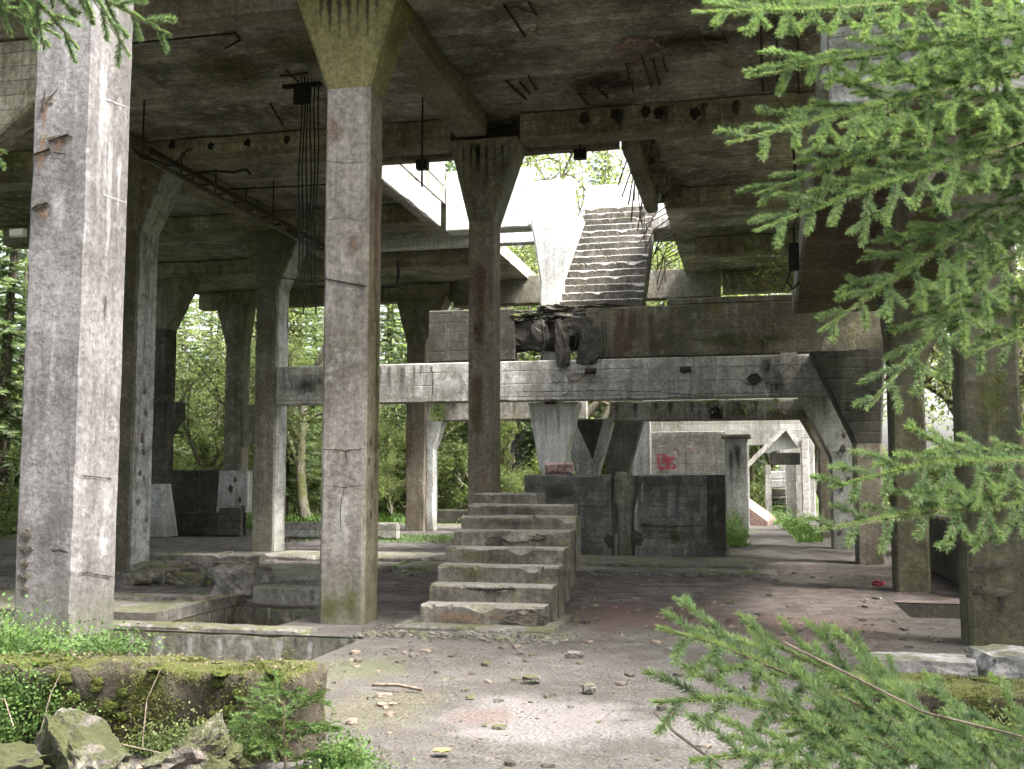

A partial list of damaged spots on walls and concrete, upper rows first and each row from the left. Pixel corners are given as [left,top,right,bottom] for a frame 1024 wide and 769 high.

damp [320,0,378,30]
spalling [573,20,812,124]
crack [323,449,361,534]
spalling [485,533,547,546]
spalling [501,609,549,626]